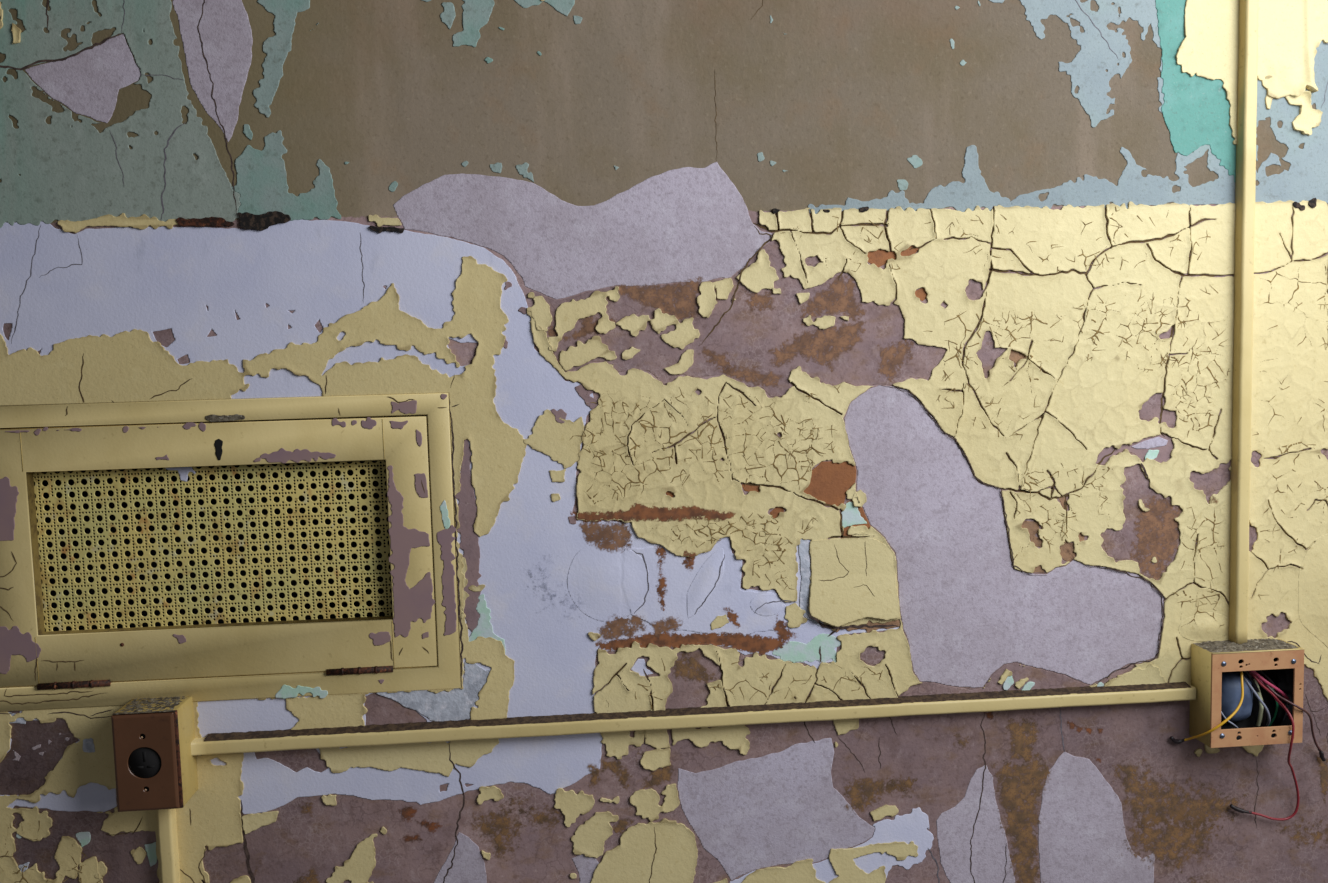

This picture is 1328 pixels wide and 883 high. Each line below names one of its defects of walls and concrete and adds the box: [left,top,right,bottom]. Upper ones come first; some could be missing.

flaking render [173,0,253,142]
peeling [0,161,1236,730]
crack [699,206,1328,684]
peeling [1247,198,1328,701]
corrosion [571,503,735,552]
corrosion [595,546,795,683]
crack [571,382,898,772]
crack [443,744,465,883]
crack [649,827,657,883]
flaking render [554,719,918,883]
flaking render [936,765,1015,883]
flaking render [1038,752,1155,883]